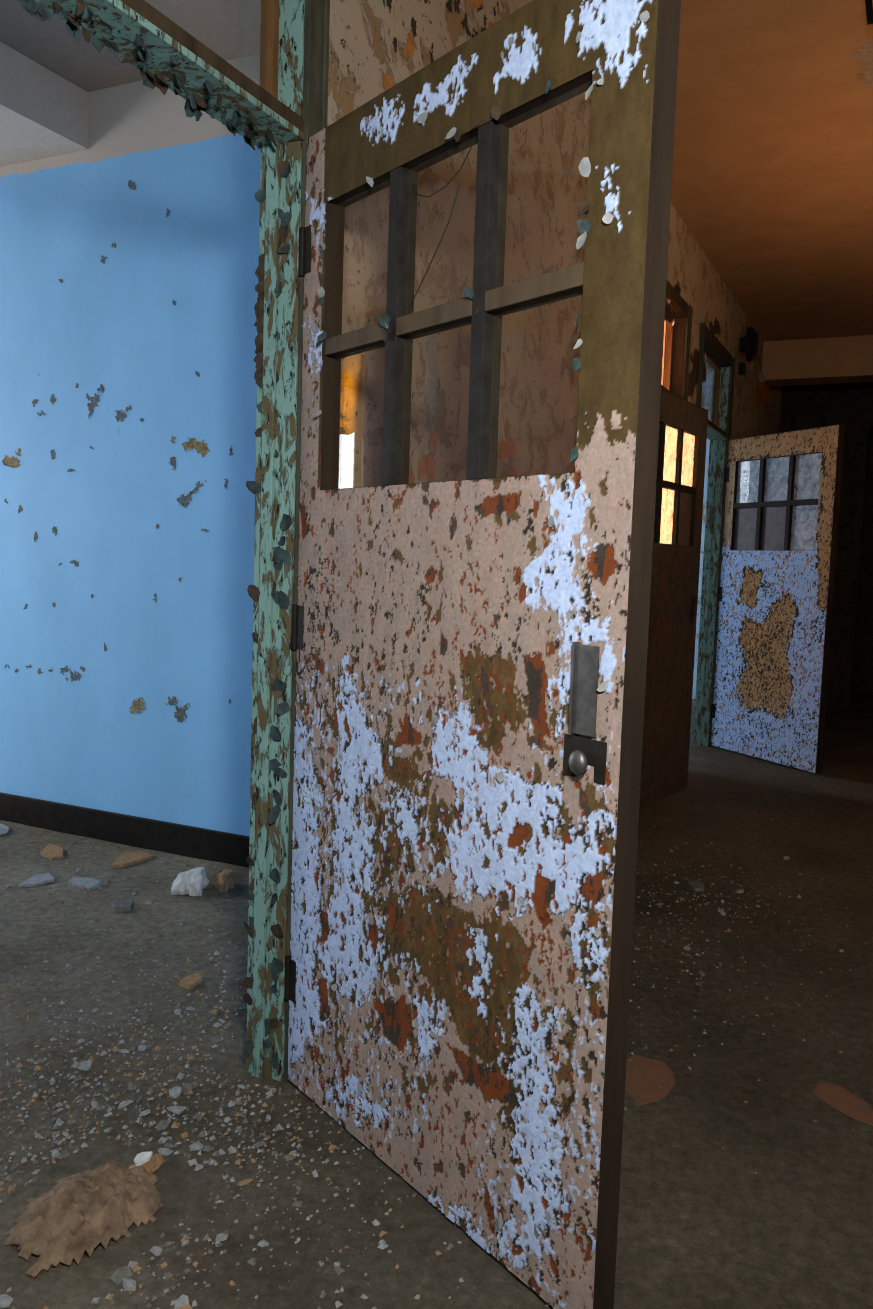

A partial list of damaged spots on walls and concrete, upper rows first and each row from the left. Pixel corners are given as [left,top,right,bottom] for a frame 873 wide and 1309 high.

peeling [2,448,21,468]
peeling [5,664,86,682]
peeling [19,0,658,1309]
peeling [711,425,839,773]